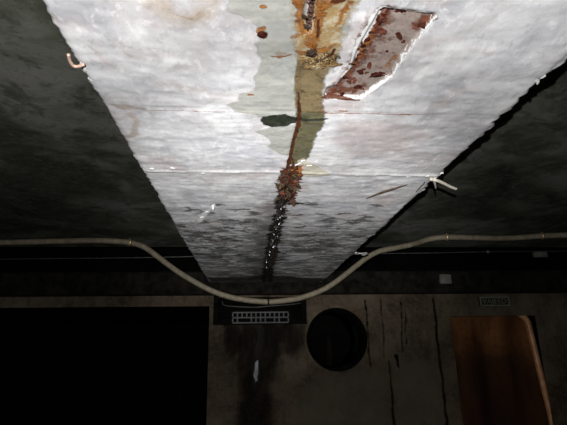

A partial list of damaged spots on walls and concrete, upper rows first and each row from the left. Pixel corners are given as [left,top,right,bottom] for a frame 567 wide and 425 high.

spalling [301,0,318,31]
corrosion [271,0,360,70]
spalling [322,5,438,101]
crack [285,92,302,170]
corrosion [274,165,303,206]
crack [247,186,308,282]
water stain [224,313,304,425]
crack [364,300,395,425]
crack [432,297,448,425]